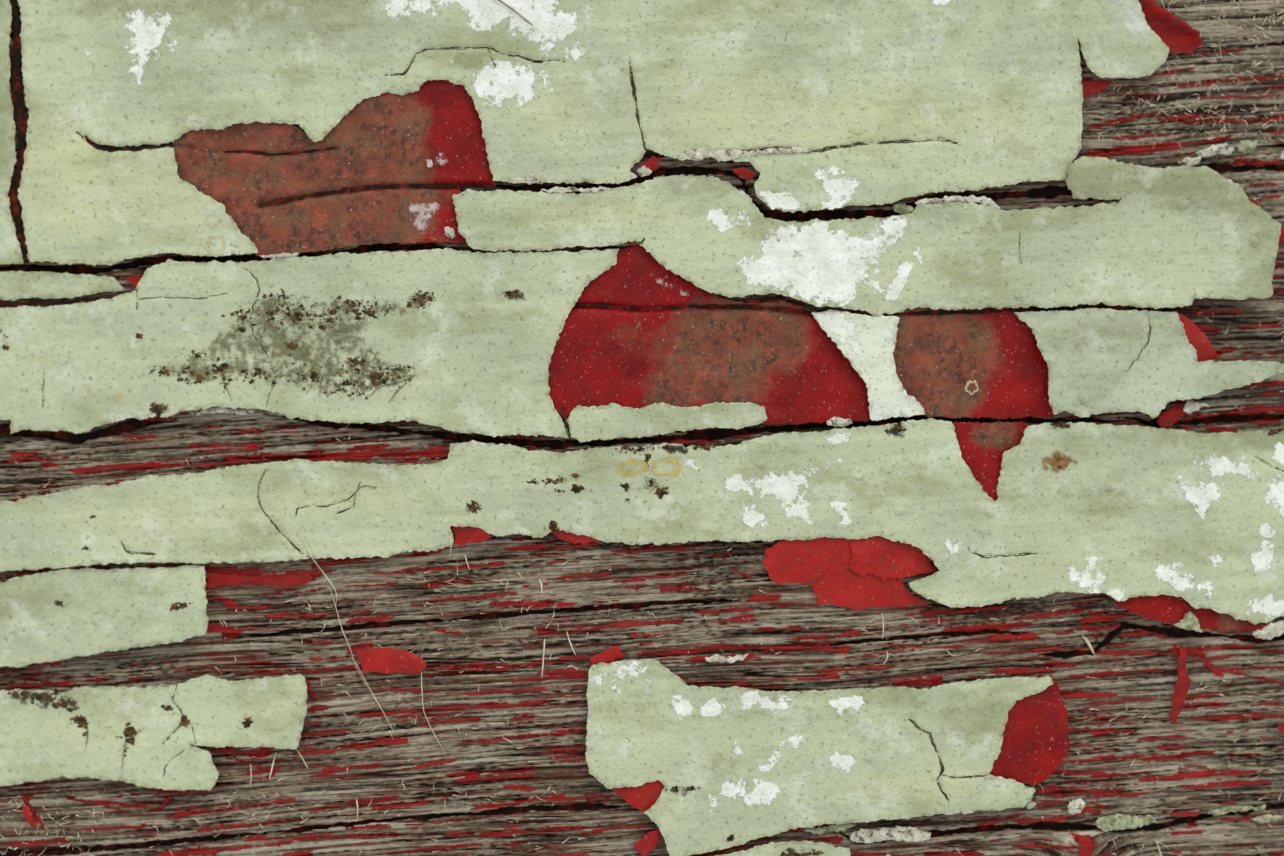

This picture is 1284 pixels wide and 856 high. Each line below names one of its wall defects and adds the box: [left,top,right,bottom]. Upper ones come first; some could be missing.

peeling [0,0,1284,668]
peeling [357,647,426,675]
peeling [1169,645,1191,723]
peeling [0,674,308,791]
peeling [585,646,1053,856]
peeling [22,805,37,829]
peeling [1078,835,1093,856]